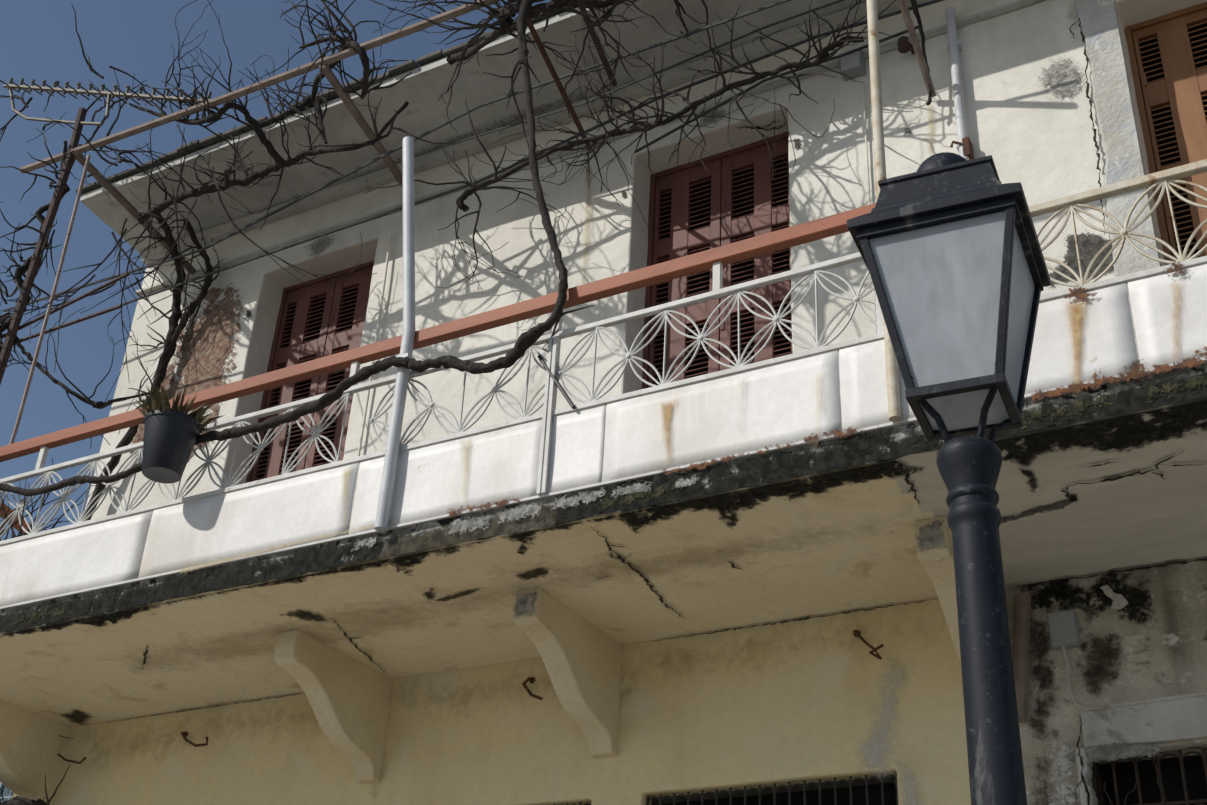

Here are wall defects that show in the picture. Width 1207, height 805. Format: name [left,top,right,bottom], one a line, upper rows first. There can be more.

spalling [1036,55,1086,101]
crack [1069,10,1105,235]
peeling [159,282,252,400]
rust [1031,259,1207,403]
peeling [129,424,144,455]
water stain [0,375,1207,637]
crack [1062,451,1203,497]
crack [591,527,939,641]
water stain [1028,573,1157,739]